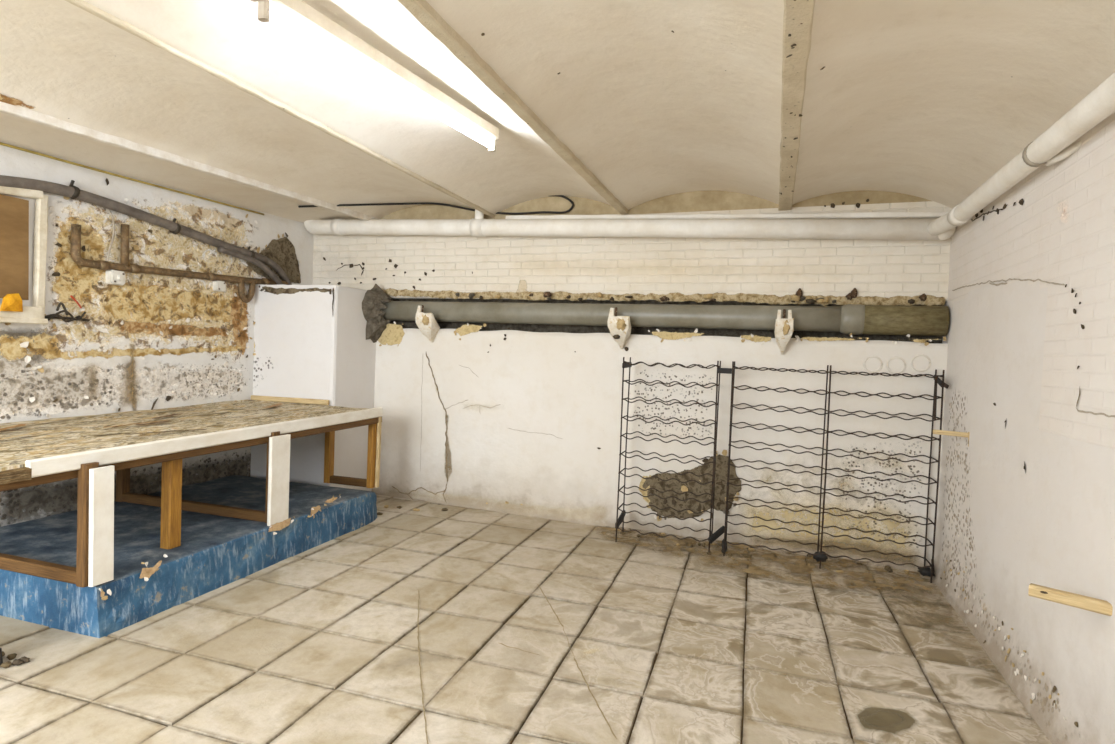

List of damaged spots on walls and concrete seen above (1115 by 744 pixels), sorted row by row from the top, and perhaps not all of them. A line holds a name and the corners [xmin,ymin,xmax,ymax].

peeling [0,178,945,373]
crack [392,353,562,502]
peeling [268,494,341,535]
damp [756,447,921,563]
peeling [139,554,168,581]
damp [888,587,962,639]
damp [857,707,916,734]